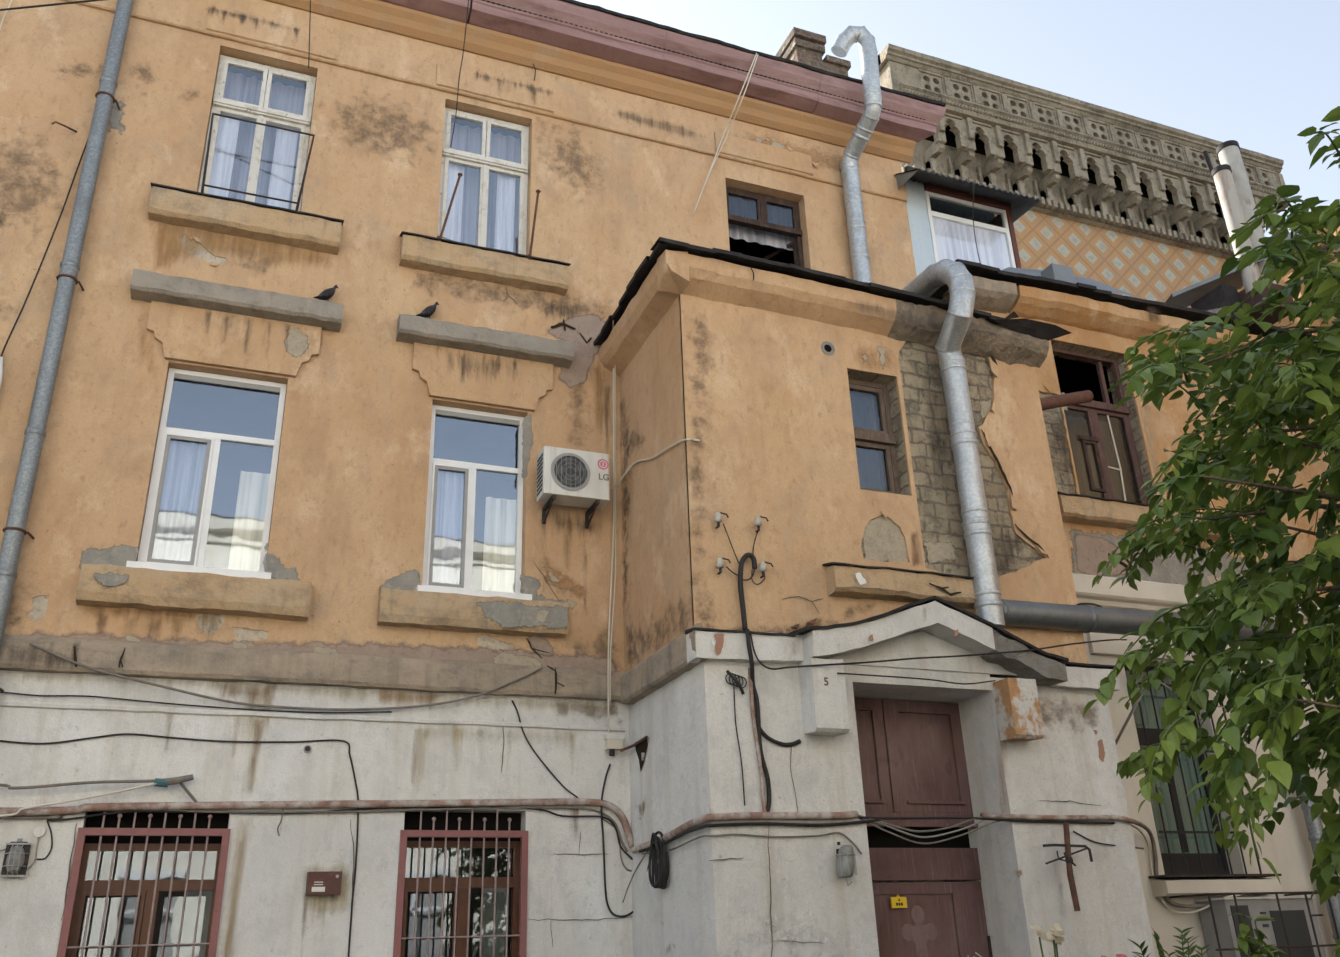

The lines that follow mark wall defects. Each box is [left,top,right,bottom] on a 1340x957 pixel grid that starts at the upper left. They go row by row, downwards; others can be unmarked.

damp [0,153,55,209]
flaking render [548,315,605,387]
flaking render [979,356,1049,570]
flaking render [855,511,908,585]
flaking render [924,541,956,564]
flaking render [27,595,616,672]